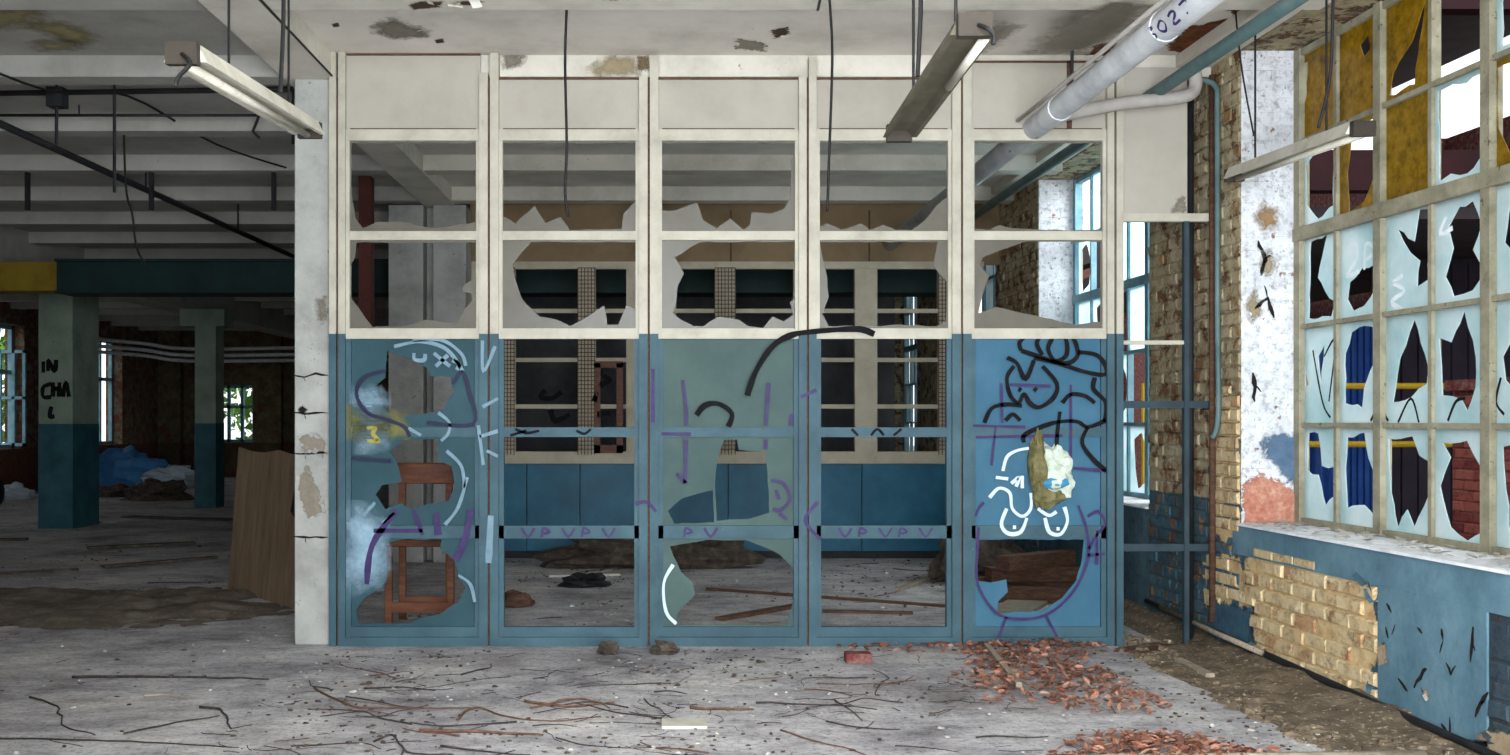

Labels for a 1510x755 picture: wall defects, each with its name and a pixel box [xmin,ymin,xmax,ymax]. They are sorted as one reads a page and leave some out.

damp [0,10,93,50]
flaking render [1195,385,1510,698]